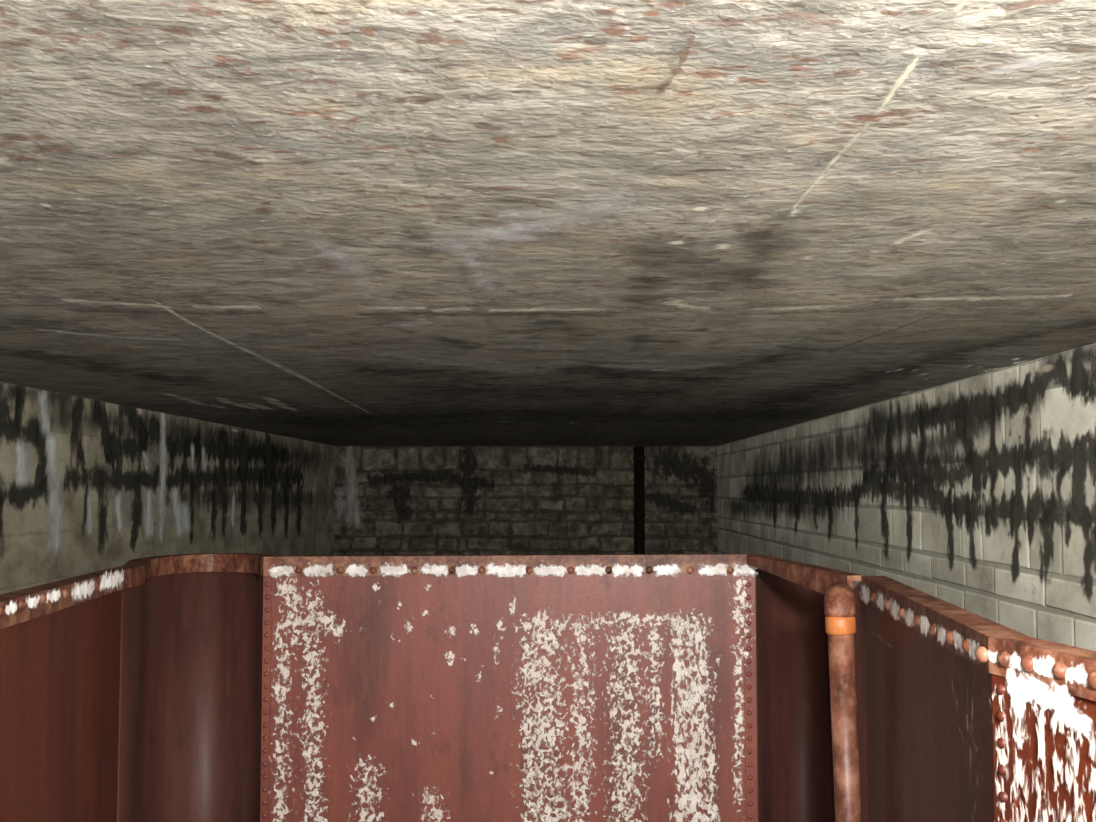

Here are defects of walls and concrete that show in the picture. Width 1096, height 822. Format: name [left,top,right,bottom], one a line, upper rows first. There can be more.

rust [1005,0,1063,10]
rust [2,29,47,47]
rust [167,27,191,37]
crack [641,36,694,94]
rust [196,95,222,113]
rust [1,135,72,161]
rust [193,148,261,166]
leakage [153,300,1096,600]
leakage [5,570,124,615]
leakage [268,562,680,822]
leakage [477,563,758,822]
leakage [859,585,1096,822]